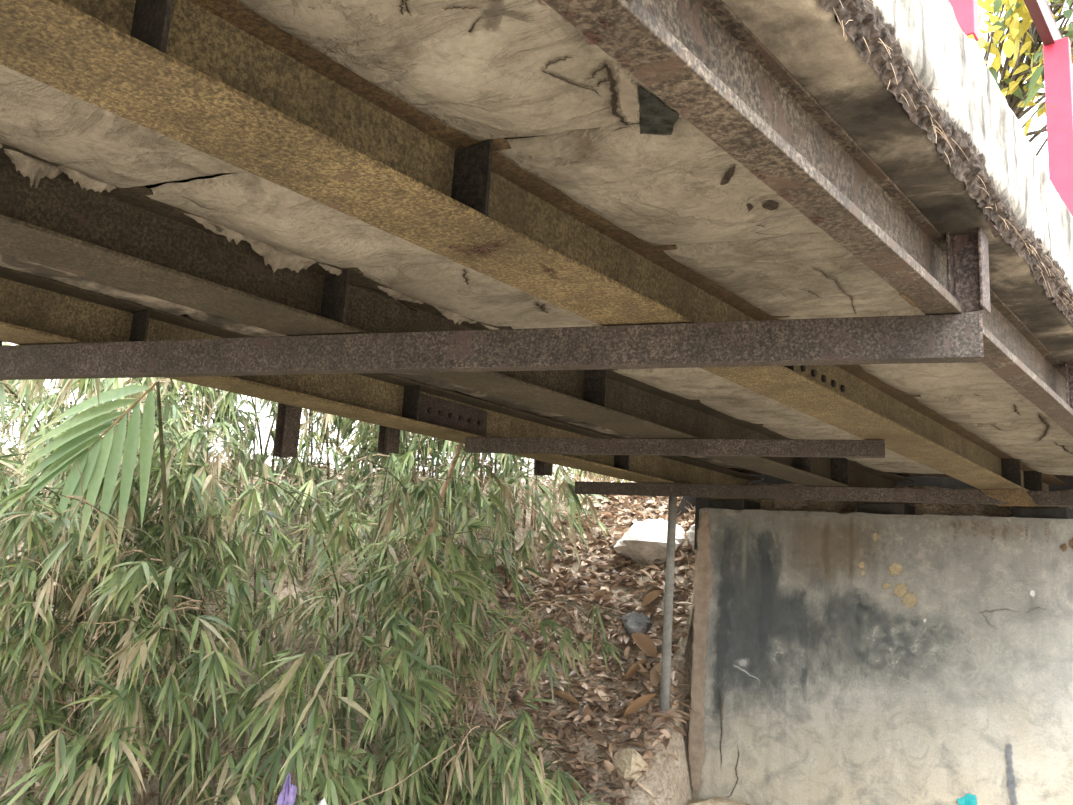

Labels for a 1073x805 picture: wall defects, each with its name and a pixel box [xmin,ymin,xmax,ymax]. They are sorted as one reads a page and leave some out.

crack [398,0,410,15]
crack [542,57,628,130]
peeling [0,143,115,193]
peeling [184,213,342,276]
water stain [688,511,1010,793]